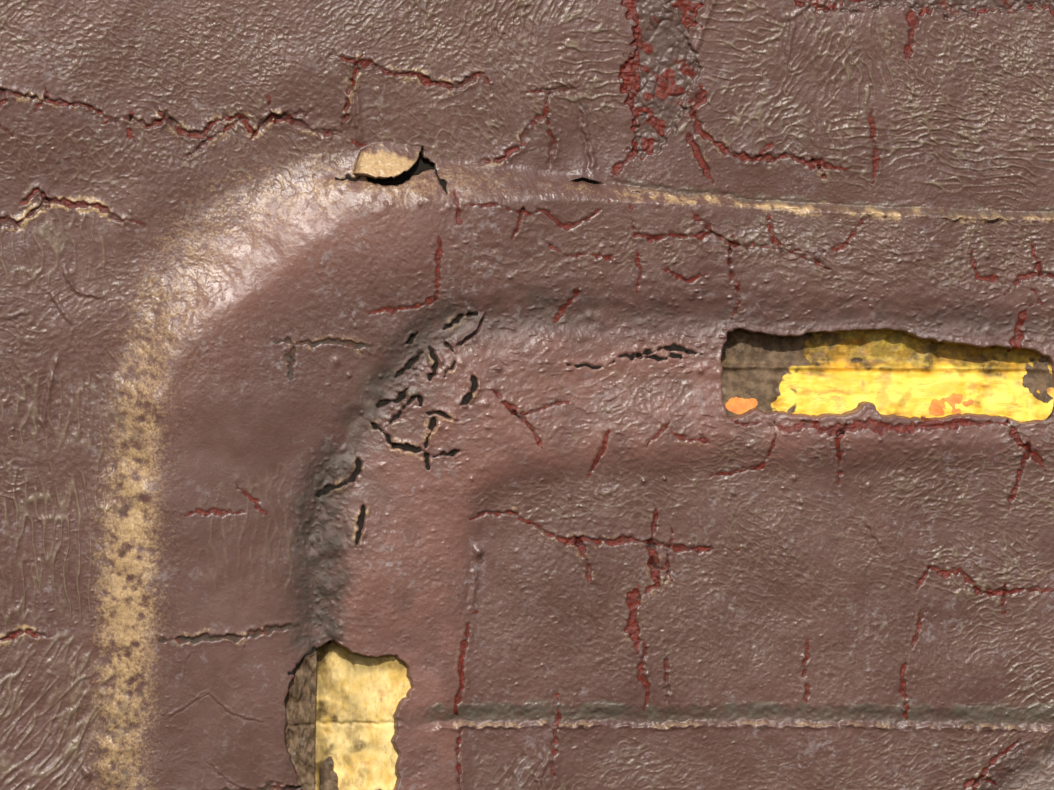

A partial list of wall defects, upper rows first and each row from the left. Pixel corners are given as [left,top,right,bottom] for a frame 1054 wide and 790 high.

crack [0,188,144,225]
crack [0,54,489,147]
peeling [335,144,448,194]
crack [686,99,880,184]
crack [366,189,864,485]
spalling [721,329,1054,437]
crack [971,242,1054,355]
crack [1006,418,1046,510]
crack [157,624,300,644]
crack [469,508,740,710]
crack [899,564,1054,719]
spalling [285,641,411,790]